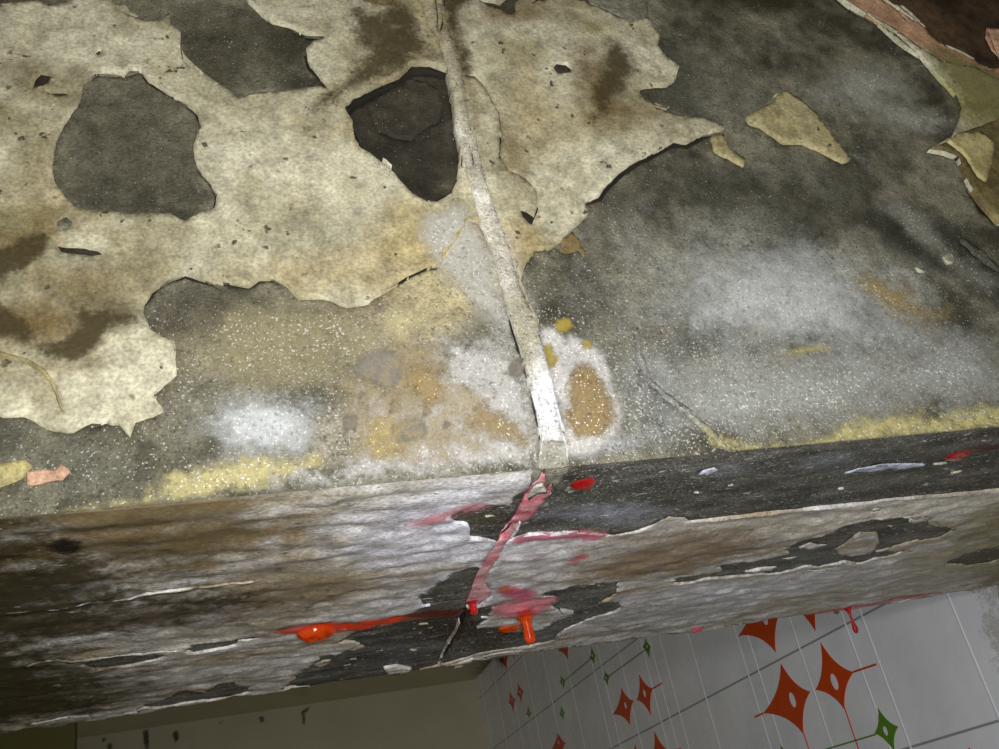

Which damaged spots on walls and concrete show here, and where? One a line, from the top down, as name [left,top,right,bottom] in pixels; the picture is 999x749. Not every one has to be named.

peeling [113,0,327,98]
peeling [52,71,217,221]
spalling [345,67,459,202]
peeling [0,221,545,518]
crack [391,263,441,287]
crack [420,0,570,661]
water stain [539,319,622,457]
peeling [451,0,999,583]
water stain [0,313,541,732]
peeling [285,568,621,687]
water stain [494,586,556,618]
water stain [513,530,605,543]